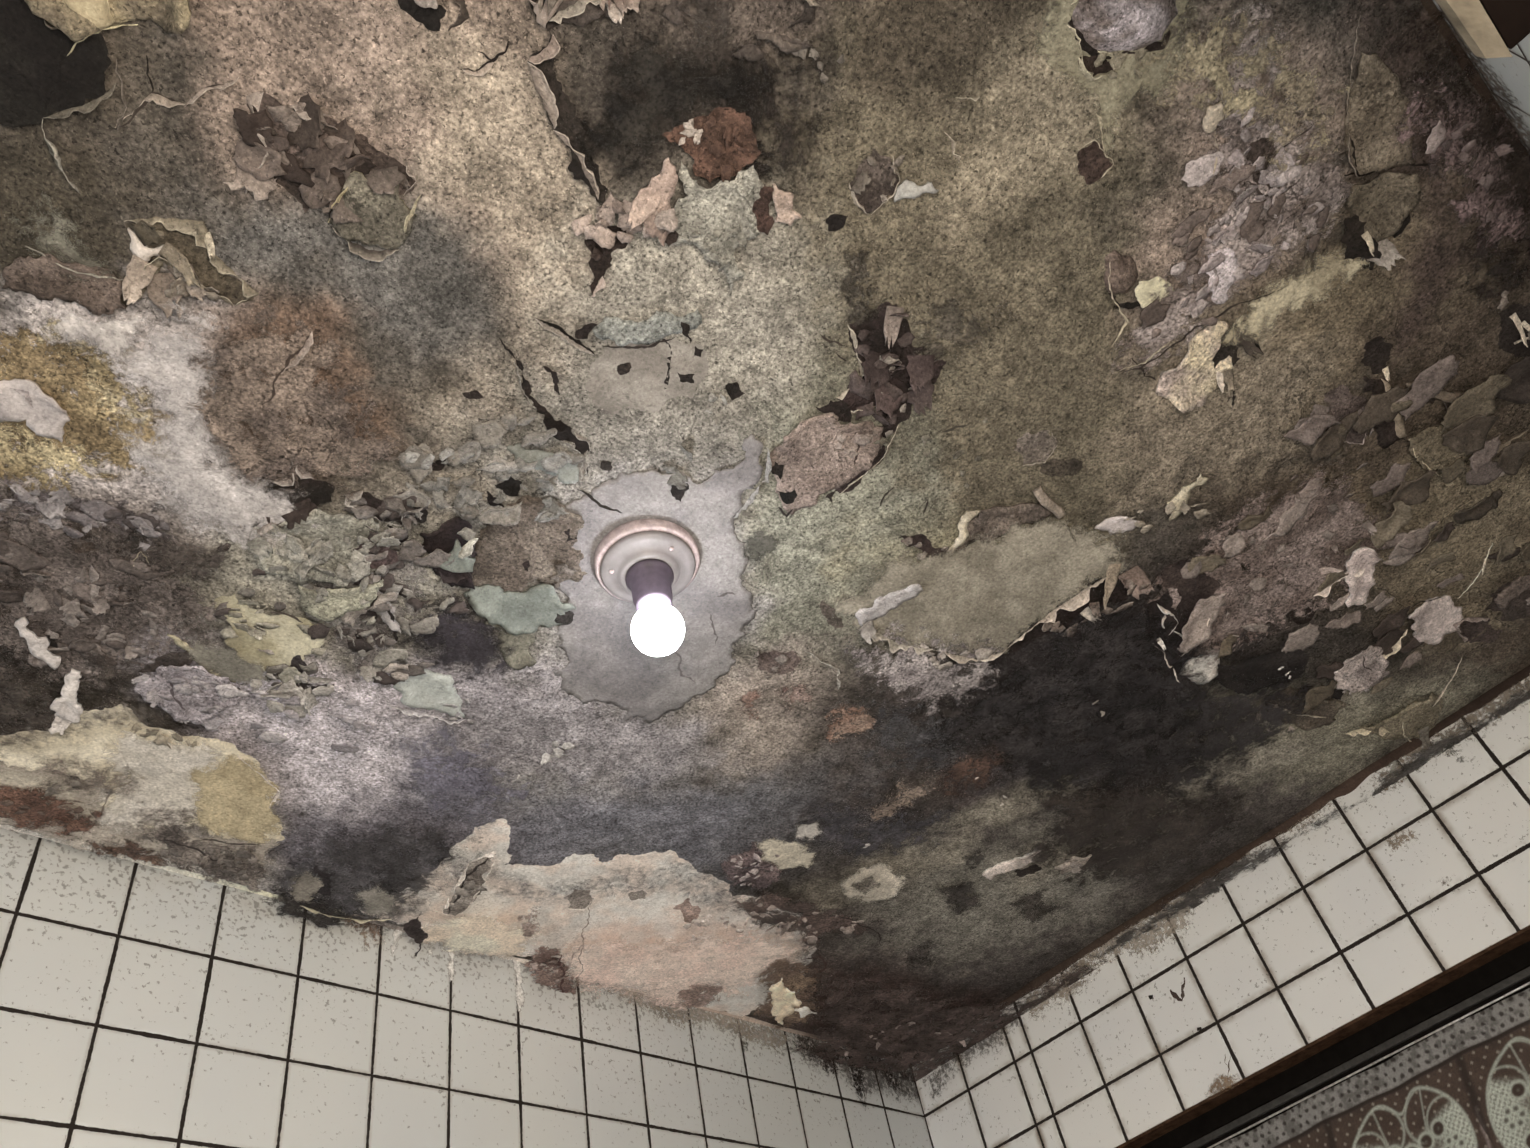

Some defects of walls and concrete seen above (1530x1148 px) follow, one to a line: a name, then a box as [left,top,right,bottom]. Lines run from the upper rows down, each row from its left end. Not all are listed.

peeling [223,91,421,262]
peeling [398,0,470,32]
peeling [732,0,845,84]
spalling [1036,0,1197,185]
peeling [1112,2,1422,413]
leakage [44,303,293,581]
peeling [0,194,989,893]
peeling [819,303,1530,749]
peeling [360,818,883,1029]
leakage [759,603,1327,924]
leakage [577,678,1530,1106]